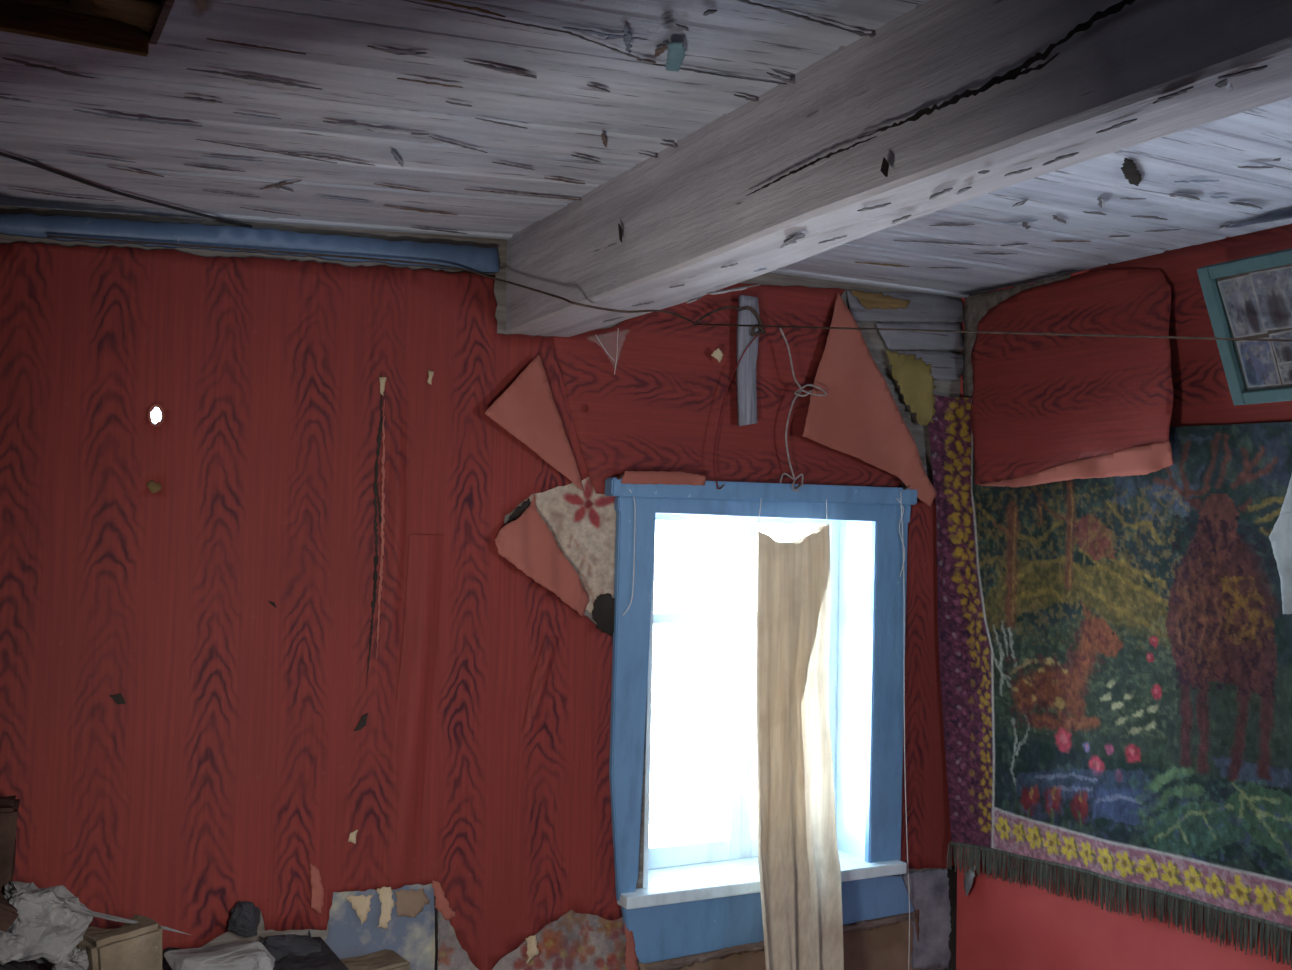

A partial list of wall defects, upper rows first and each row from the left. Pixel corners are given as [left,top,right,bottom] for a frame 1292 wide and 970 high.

crack [738,0,1135,196]
crack [616,223,624,243]